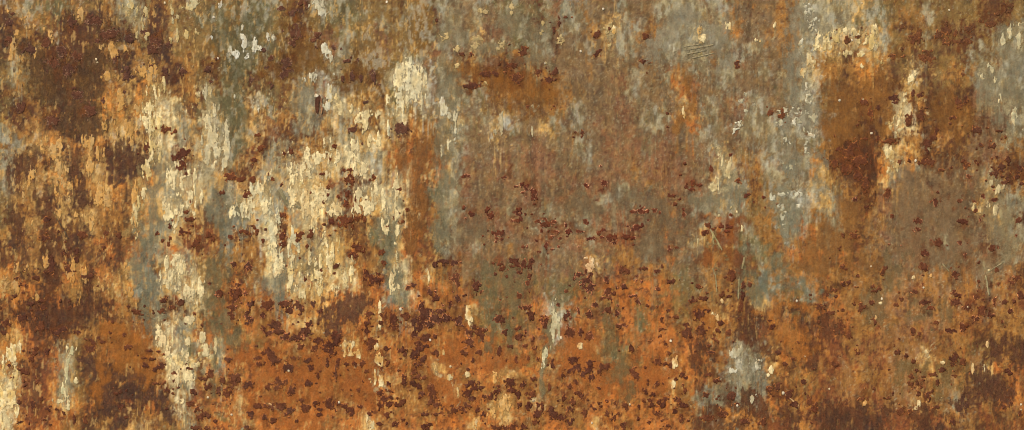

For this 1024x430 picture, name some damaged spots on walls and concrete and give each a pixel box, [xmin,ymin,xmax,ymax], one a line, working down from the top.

peeling [308,0,329,17]
rust [453,43,559,114]
rust [0,10,194,428]
peeling [226,42,427,329]
rust [823,89,1024,225]
rust [186,182,1024,430]
peeling [340,340,361,359]
peeling [370,343,384,388]
peeling [434,349,471,397]